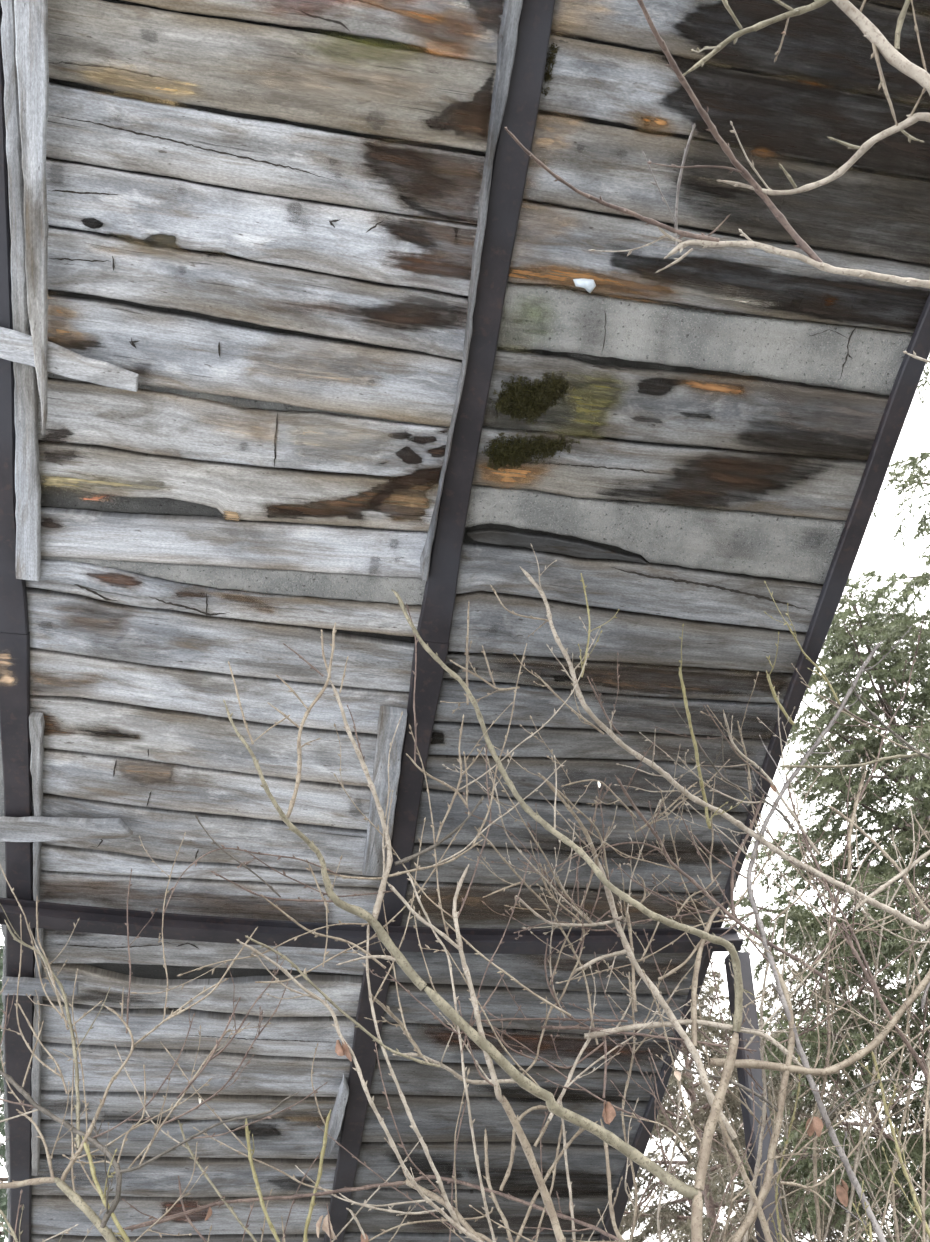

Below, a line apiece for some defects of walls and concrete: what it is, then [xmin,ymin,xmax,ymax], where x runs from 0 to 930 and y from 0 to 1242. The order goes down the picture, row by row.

leakage [659,0,930,263]
leakage [363,143,485,278]
leakage [266,467,442,522]
leakage [597,395,881,507]